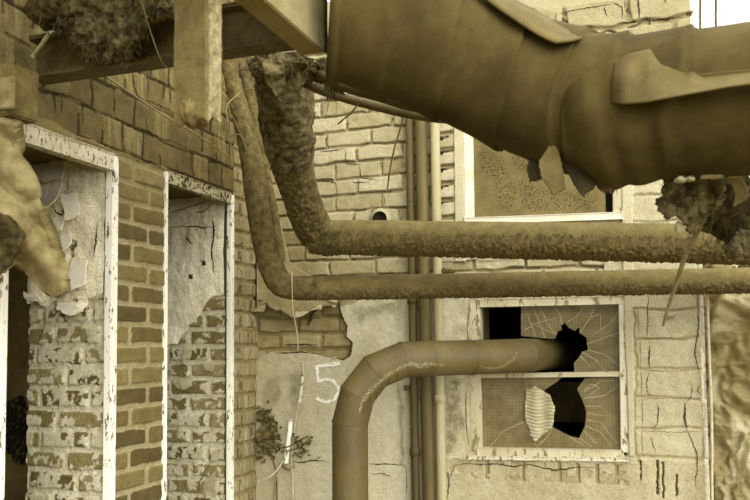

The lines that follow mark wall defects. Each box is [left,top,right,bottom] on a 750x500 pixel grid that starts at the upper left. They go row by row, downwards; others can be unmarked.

flaking render [32,161,89,316]
crack [169,200,217,274]
flaking render [280,223,310,276]
flaking render [23,292,43,304]
flaking render [253,264,353,360]
flaking render [179,374,192,390]
crack [638,296,703,491]
crack [447,463,604,496]